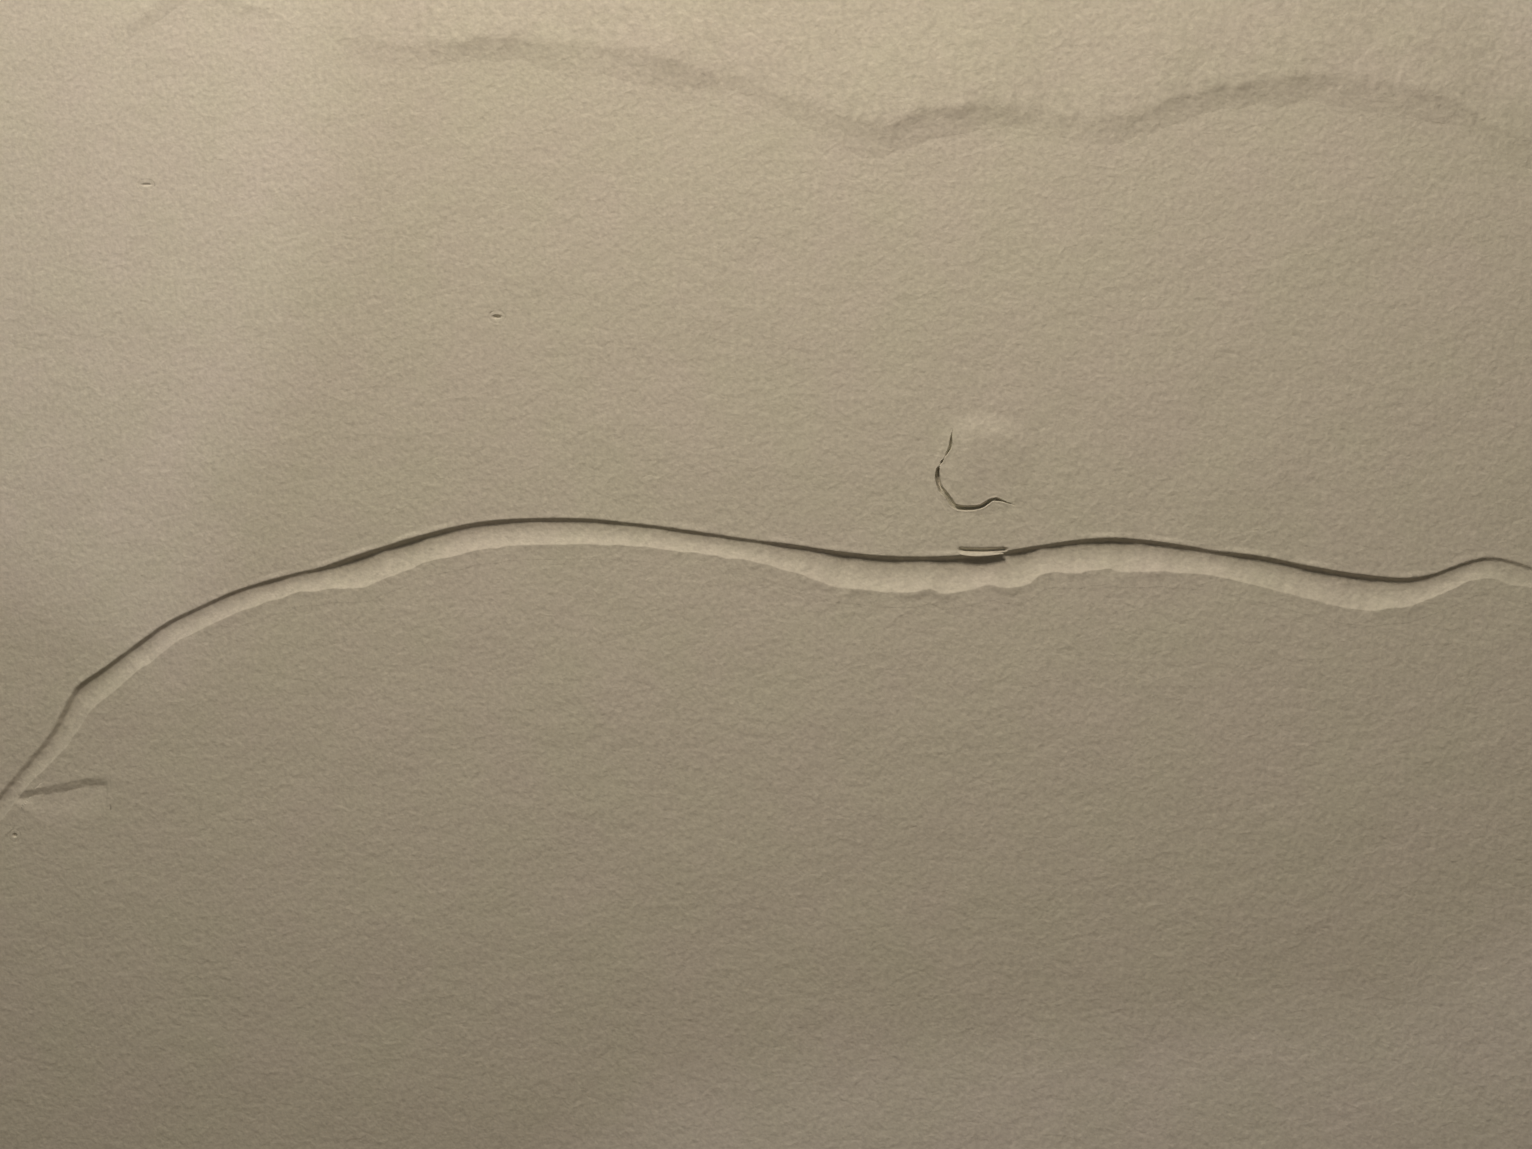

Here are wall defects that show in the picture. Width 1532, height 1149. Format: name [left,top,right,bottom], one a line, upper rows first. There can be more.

crack [0,476,1532,847]